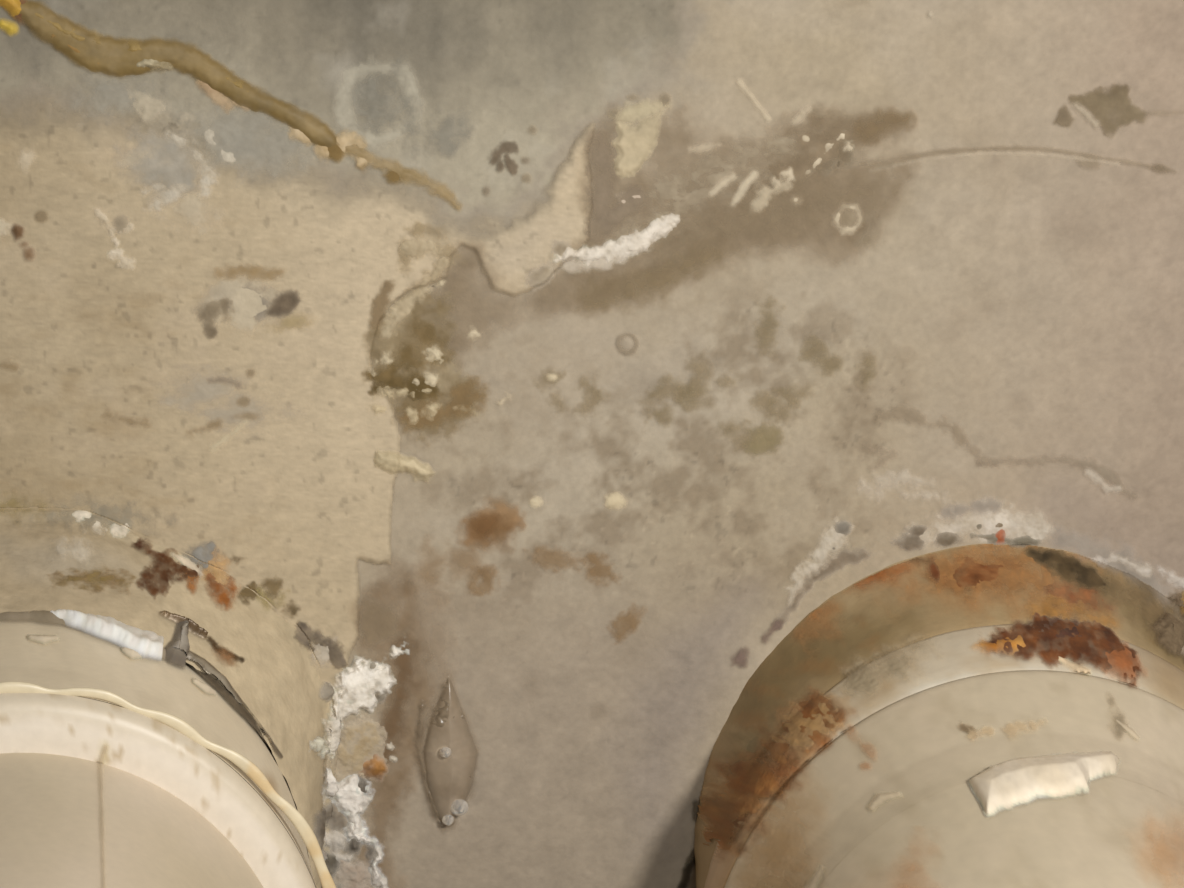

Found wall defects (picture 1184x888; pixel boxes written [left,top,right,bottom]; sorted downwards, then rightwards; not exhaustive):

crack [0,0,461,209]
crack [838,146,1173,172]
leakage [438,112,911,362]
leakage [725,390,805,454]
corrosion [55,538,237,610]
leakage [188,542,217,570]
leakage [240,579,283,604]
corrosion [854,548,1108,592]
corrosion [979,612,1142,687]
leakage [289,573,447,888]
corrosion [698,691,845,851]